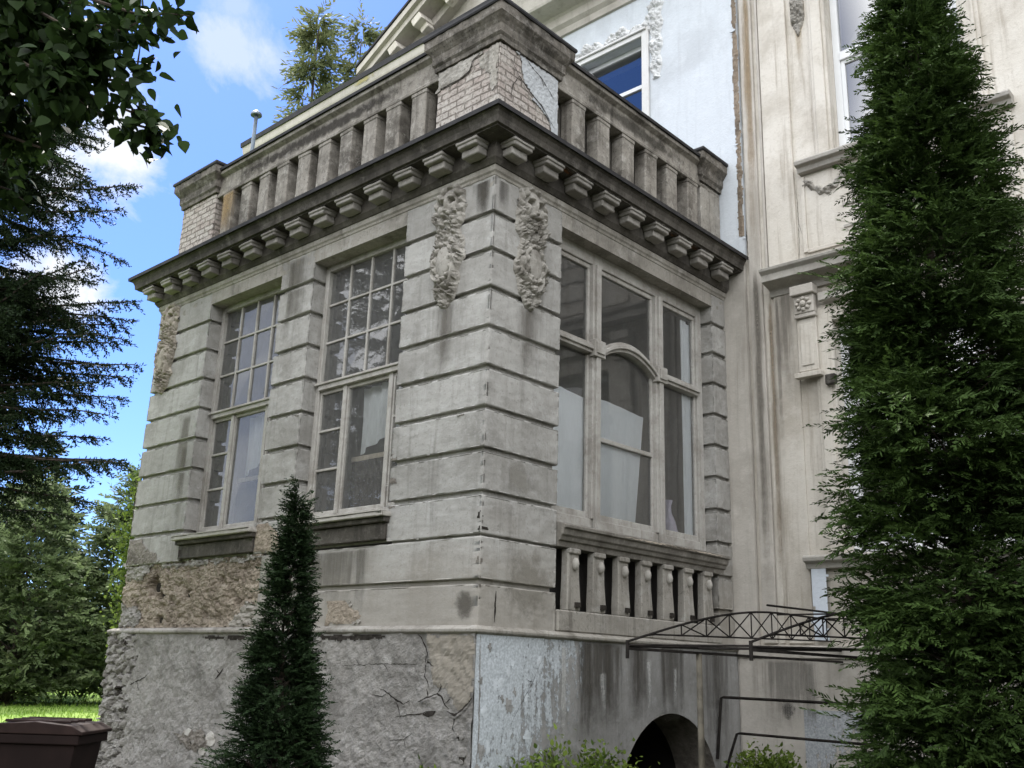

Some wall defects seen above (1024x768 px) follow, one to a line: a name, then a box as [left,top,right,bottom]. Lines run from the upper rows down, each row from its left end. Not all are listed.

spalling [730,0,746,239]
spalling [118,520,282,648]
spalling [317,600,385,643]
crack [343,635,472,745]
damp [583,645,619,697]